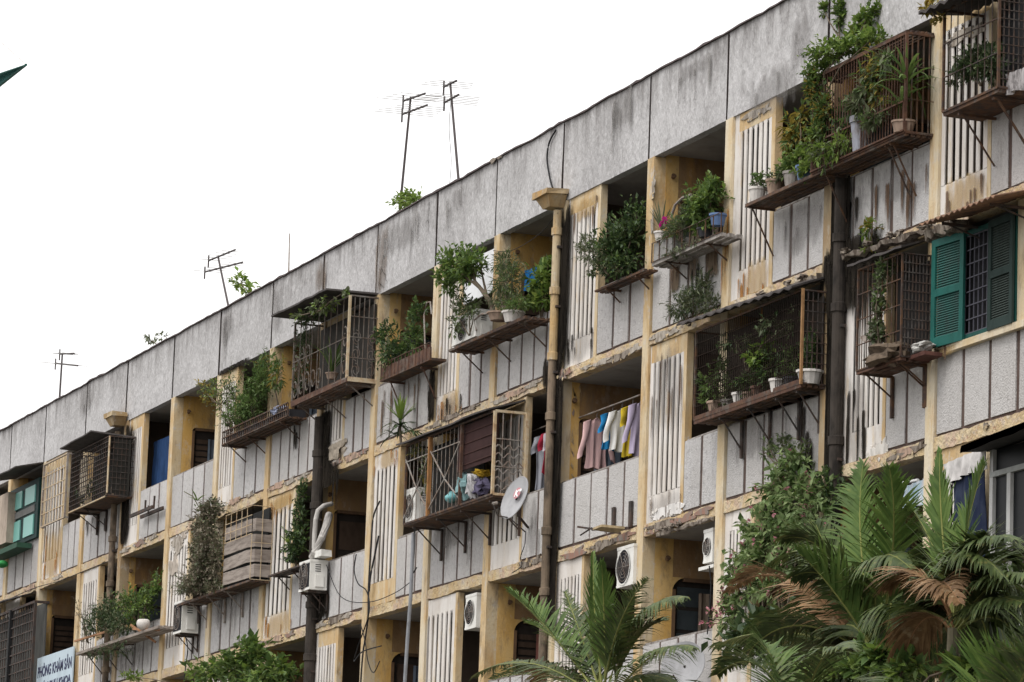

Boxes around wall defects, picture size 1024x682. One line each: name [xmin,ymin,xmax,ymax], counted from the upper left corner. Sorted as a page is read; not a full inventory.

spalling [560,502,714,560]